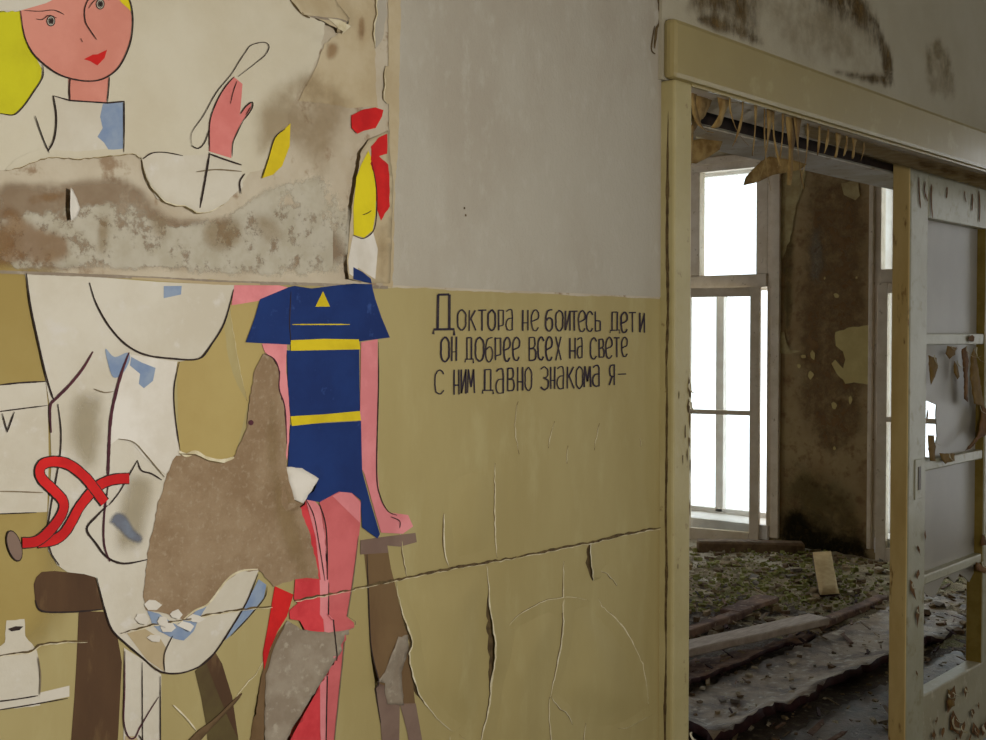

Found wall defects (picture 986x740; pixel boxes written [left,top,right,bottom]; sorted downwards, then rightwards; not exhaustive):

water stain [696,0,754,41]
water stain [823,0,867,27]
water stain [850,35,892,86]
peeling [0,0,401,289]
peeling [691,93,865,260]
crack [121,130,669,740]
peeling [832,325,868,385]
peeling [928,335,986,464]
peeling [135,353,319,642]
water stain [781,475,867,558]
crack [0,640,87,657]
peeling [264,620,354,740]